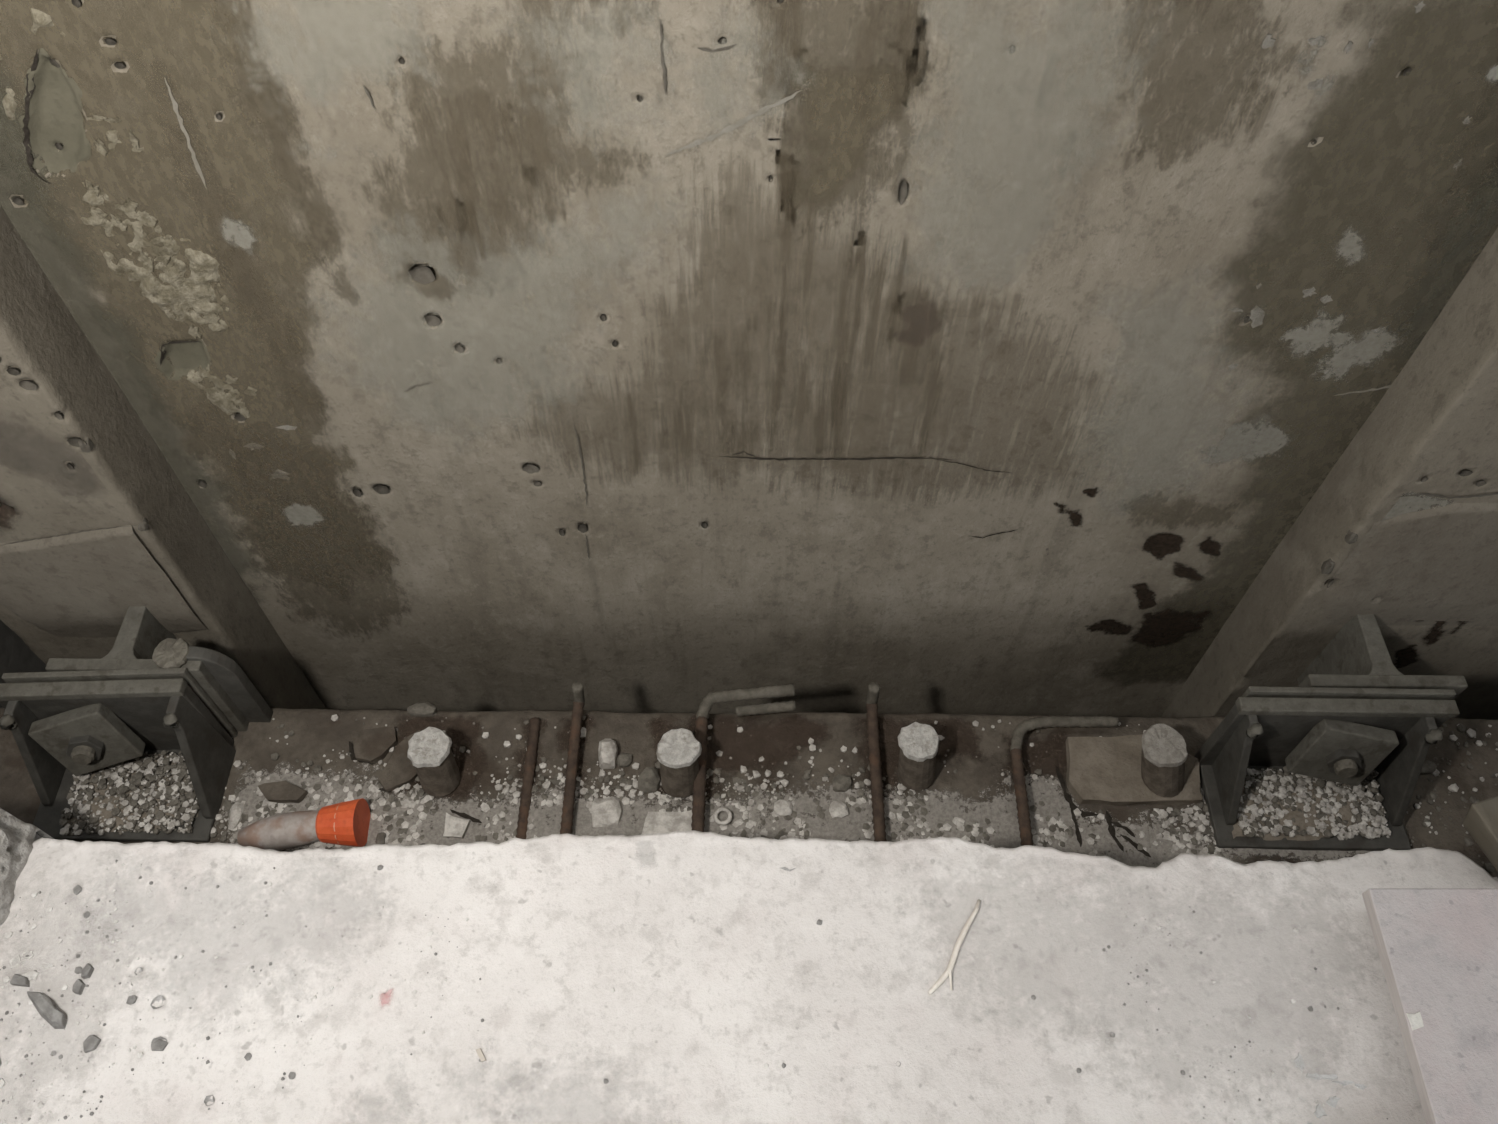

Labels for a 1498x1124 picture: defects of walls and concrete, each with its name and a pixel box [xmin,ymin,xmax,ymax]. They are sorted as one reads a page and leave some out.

peeling [2,8,229,339]
leakage [385,0,629,299]
leakage [755,0,926,211]
peeling [221,217,256,251]
leakage [0,0,404,632]
leakage [1086,0,1498,684]
peeling [1281,287,1401,380]
peeling [187,364,257,418]
crack [718,451,1010,473]
corrosion [650,714,828,804]
corrosion [856,718,981,800]
corrosion [1004,732,1067,785]